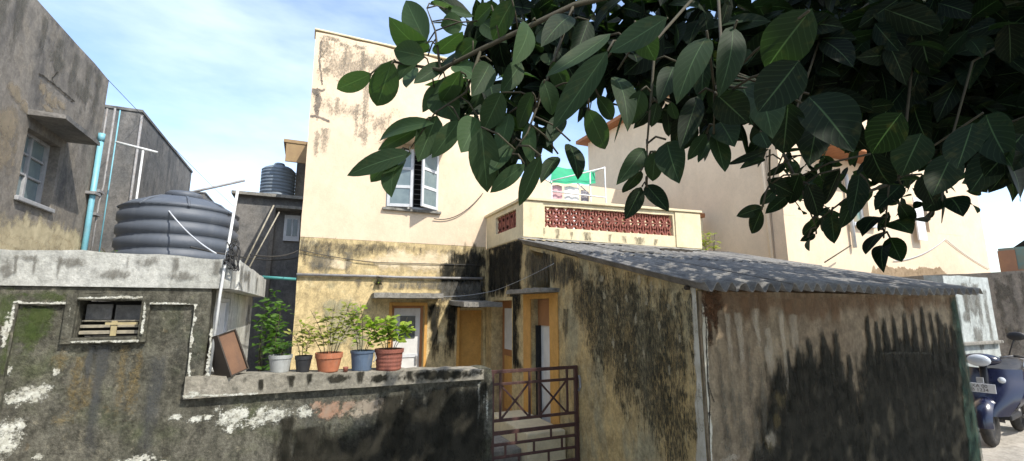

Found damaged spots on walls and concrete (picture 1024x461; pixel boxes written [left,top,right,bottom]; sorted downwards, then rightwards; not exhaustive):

leakage [317,35,398,144]
leakage [1,255,36,278]
leakage [270,239,704,461]
peeling [0,368,60,461]
peeling [170,391,384,434]